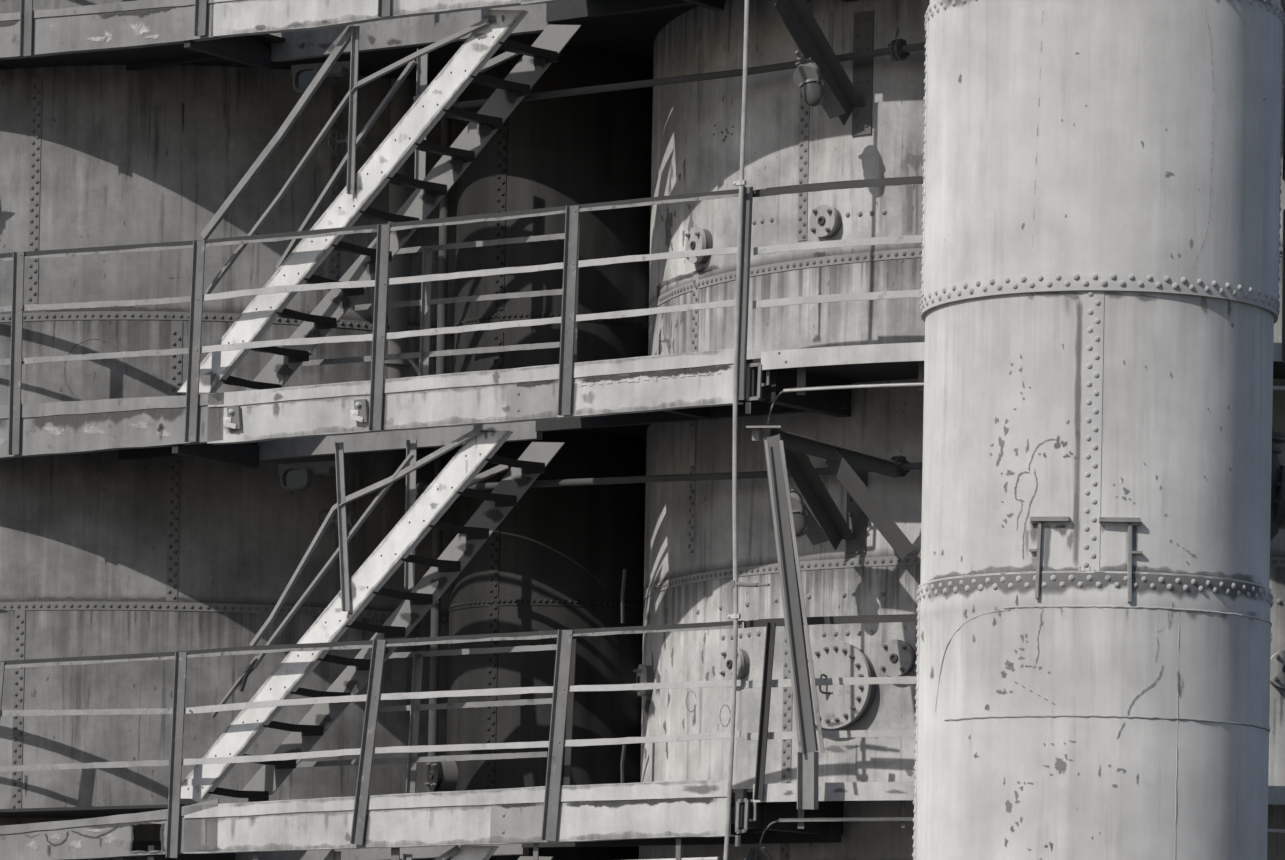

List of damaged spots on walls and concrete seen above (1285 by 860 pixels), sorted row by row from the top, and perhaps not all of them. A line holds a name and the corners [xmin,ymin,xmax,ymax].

peeling [989,354,1077,527]
peeling [984,633,1050,710]
crack [1117,603,1173,738]
peeling [1043,740,1079,776]
peeling [1003,777,1033,846]